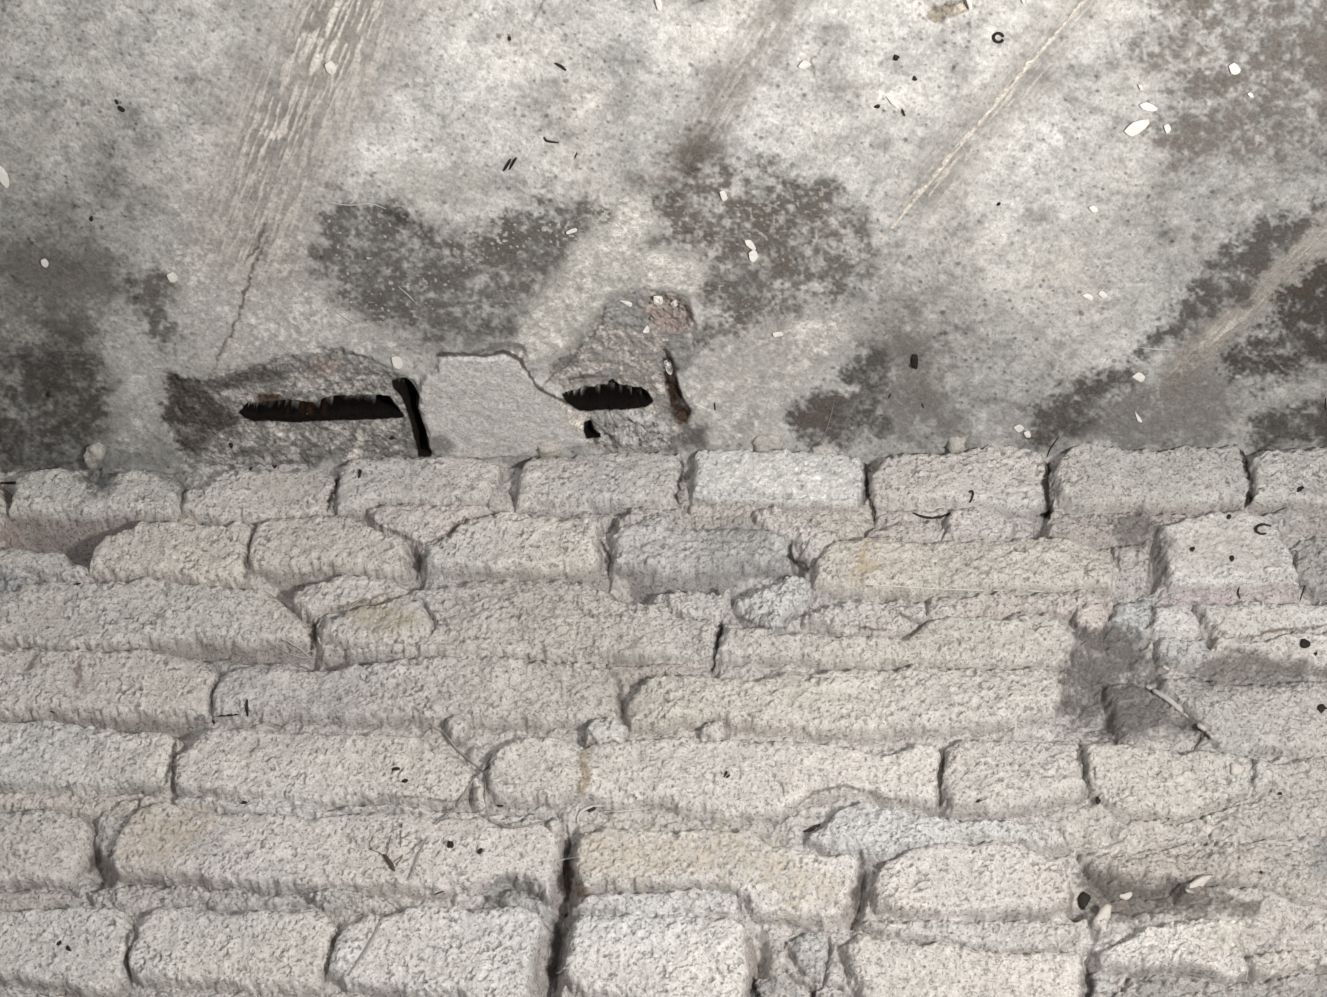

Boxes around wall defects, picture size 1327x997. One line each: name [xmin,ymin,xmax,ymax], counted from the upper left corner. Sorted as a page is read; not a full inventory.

water stain [0,240,177,472]
spalling [158,348,432,470]
water stain [311,196,612,343]
spalling [545,288,696,452]
corrosion [660,357,691,425]
water stain [640,124,877,348]
water stain [1023,202,1327,452]